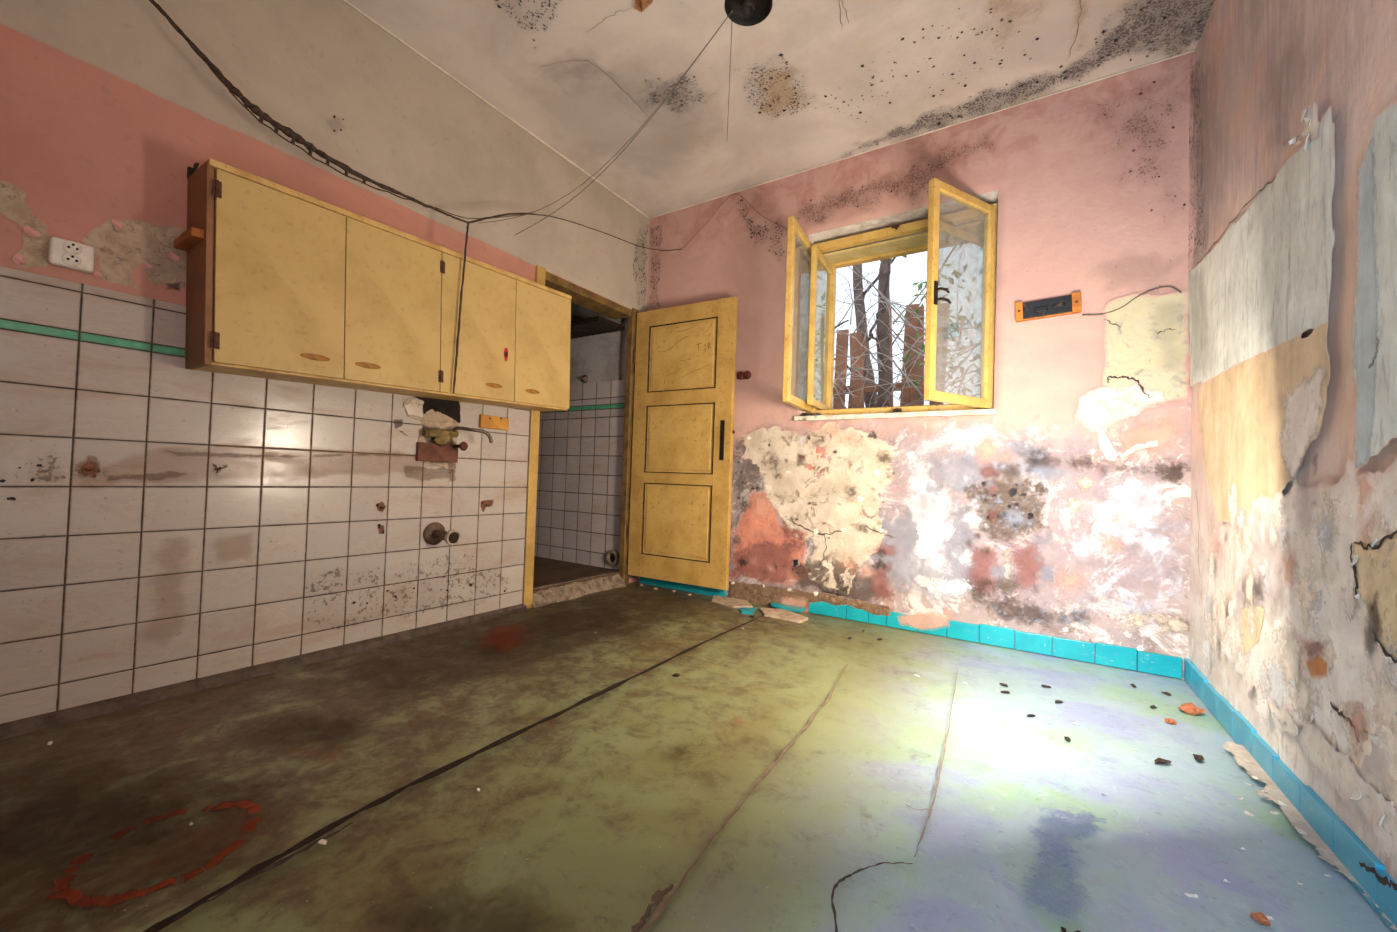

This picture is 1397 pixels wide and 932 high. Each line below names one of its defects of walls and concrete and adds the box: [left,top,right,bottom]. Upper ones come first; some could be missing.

leakage [736,0,1215,268]
flaking render [80,218,187,291]
peeling [394,396,461,445]
leakage [732,439,804,509]
flaking render [729,421,947,629]
leakage [797,547,894,601]
leakage [915,443,1145,622]
flaking render [1073,380,1168,462]
leakage [1161,466,1182,483]
flaking render [1203,456,1397,812]
crack [831,669,958,932]
peeling [1221,741,1397,931]